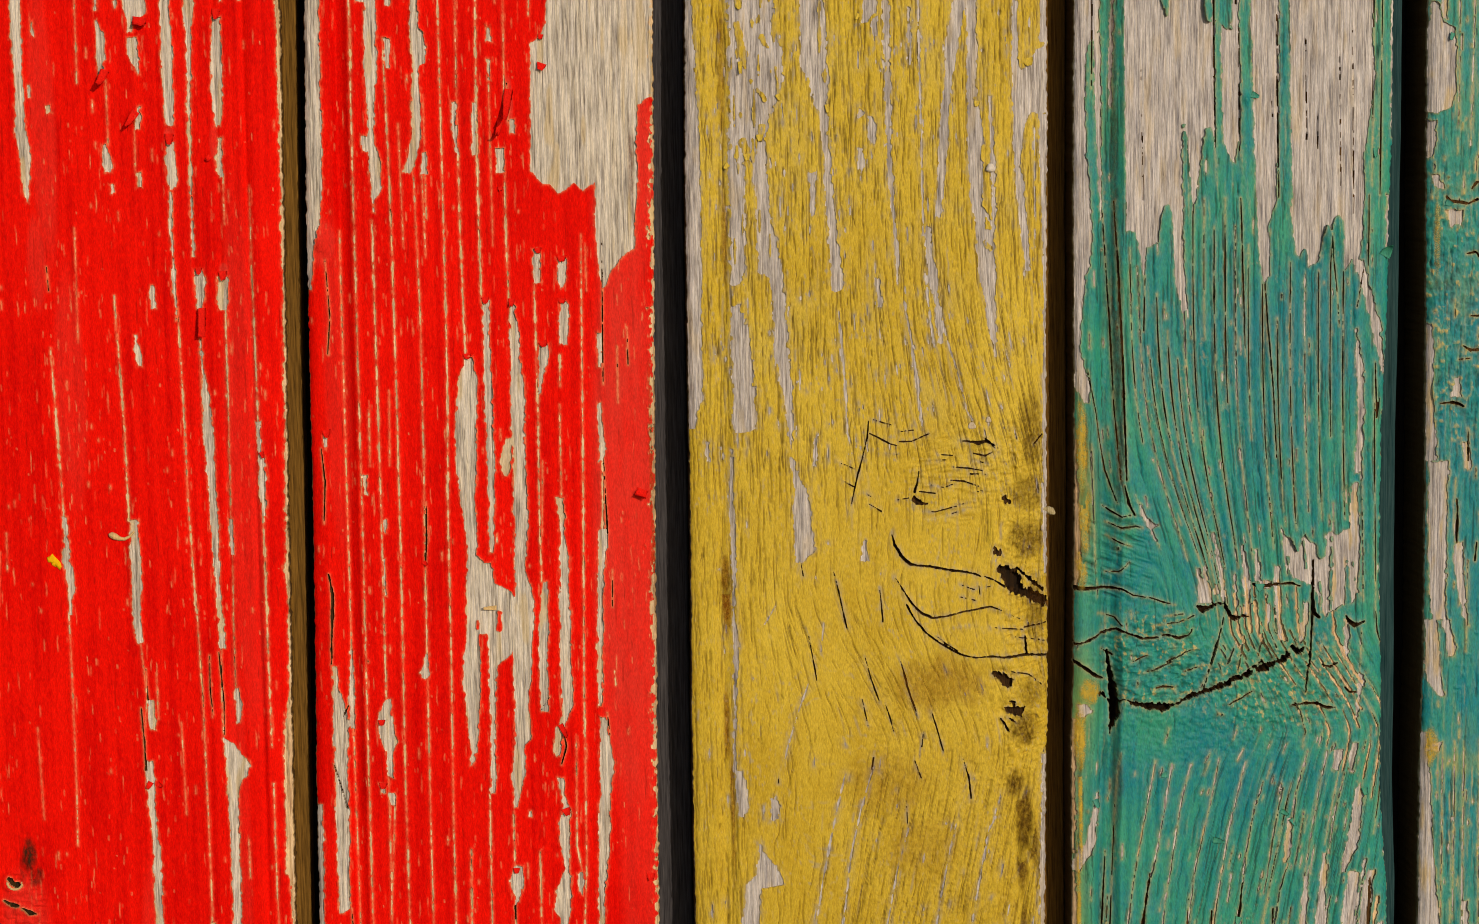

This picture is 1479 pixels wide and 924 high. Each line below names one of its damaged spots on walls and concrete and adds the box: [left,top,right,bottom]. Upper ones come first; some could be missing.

peeling [455,247,570,817]
peeling [495,0,660,924]
peeling [685,0,711,462]
peeling [935,0,1048,607]
peeling [1073,0,1102,403]
crack [838,0,1383,733]
peeling [1124,0,1394,313]
crack [1440,401,1469,461]
crack [1455,498,1477,600]
crack [816,658,997,924]
crack [1101,750,1343,924]
crack [1365,876,1373,924]